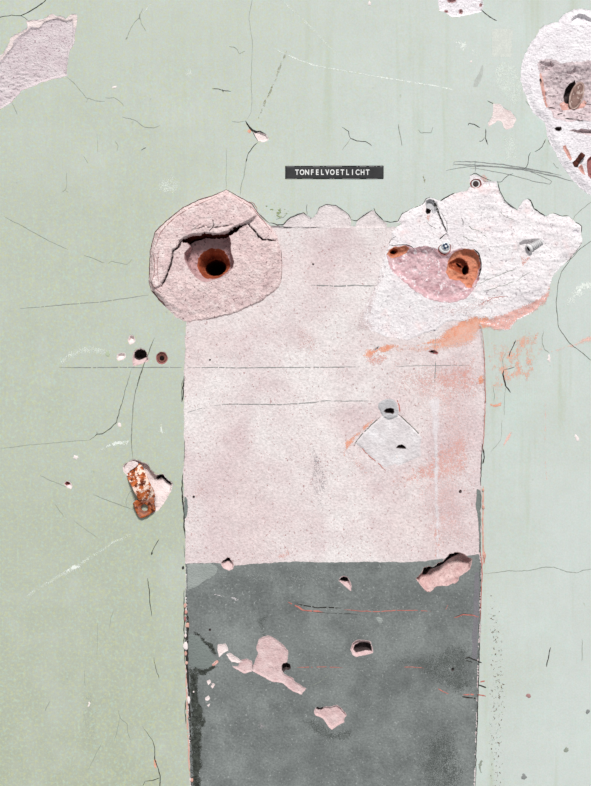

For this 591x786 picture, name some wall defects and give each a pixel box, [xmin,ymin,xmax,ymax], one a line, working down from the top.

spalling [0,14,78,109]
crack [149,3,530,307]
spalling [438,0,484,17]
peeling [488,104,516,130]
spalling [520,9,591,195]
crack [470,140,591,449]
crack [9,337,155,456]
flaking render [123,175,582,786]